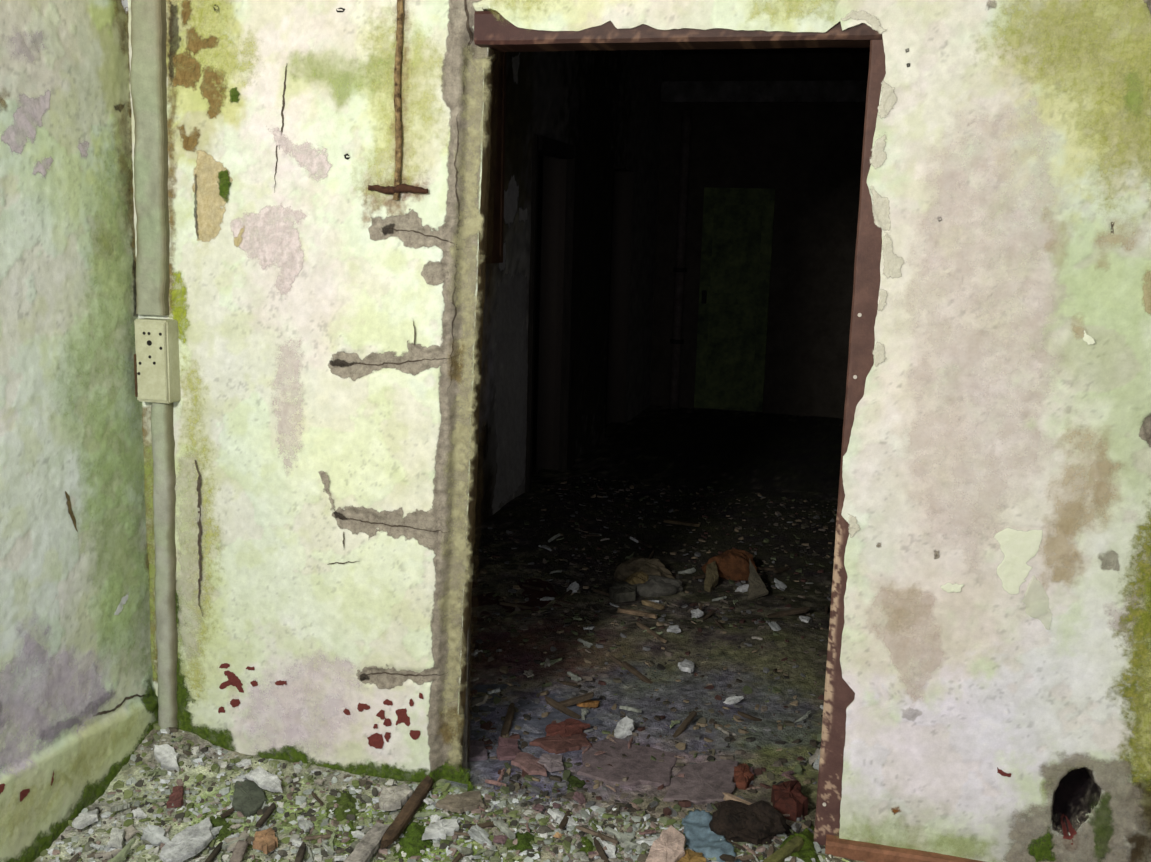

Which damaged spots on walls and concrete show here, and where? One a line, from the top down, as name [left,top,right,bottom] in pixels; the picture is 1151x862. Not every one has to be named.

peeling [172,0,227,119]
peeling [1,90,50,154]
water stain [129,170,139,316]
peeling [1143,271,1151,314]
spalling [319,0,527,771]
water stain [142,408,158,682]
spalling [1006,753,1143,862]